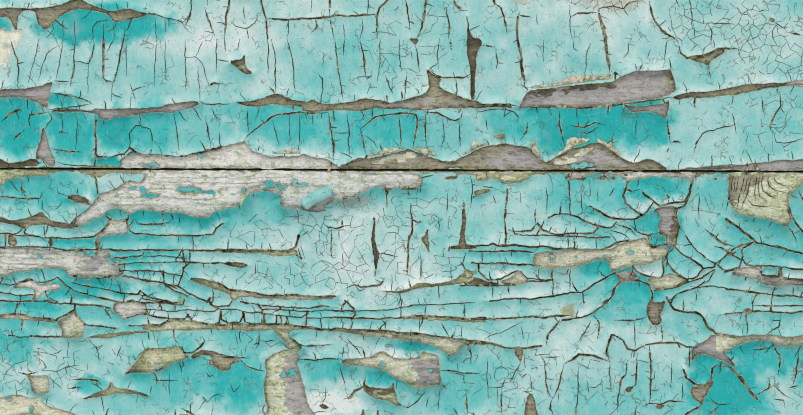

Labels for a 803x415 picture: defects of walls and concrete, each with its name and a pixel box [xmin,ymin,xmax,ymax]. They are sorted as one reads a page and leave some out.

peeling [0,78,52,112]
crack [1,0,671,167]
peeling [237,21,803,121]
crack [569,0,803,82]
crack [667,94,803,161]
crack [230,176,496,291]
peeling [0,99,803,415]
crack [512,191,548,245]
crack [690,194,735,247]
crack [0,338,122,392]
crack [401,287,729,415]
crack [722,288,803,408]